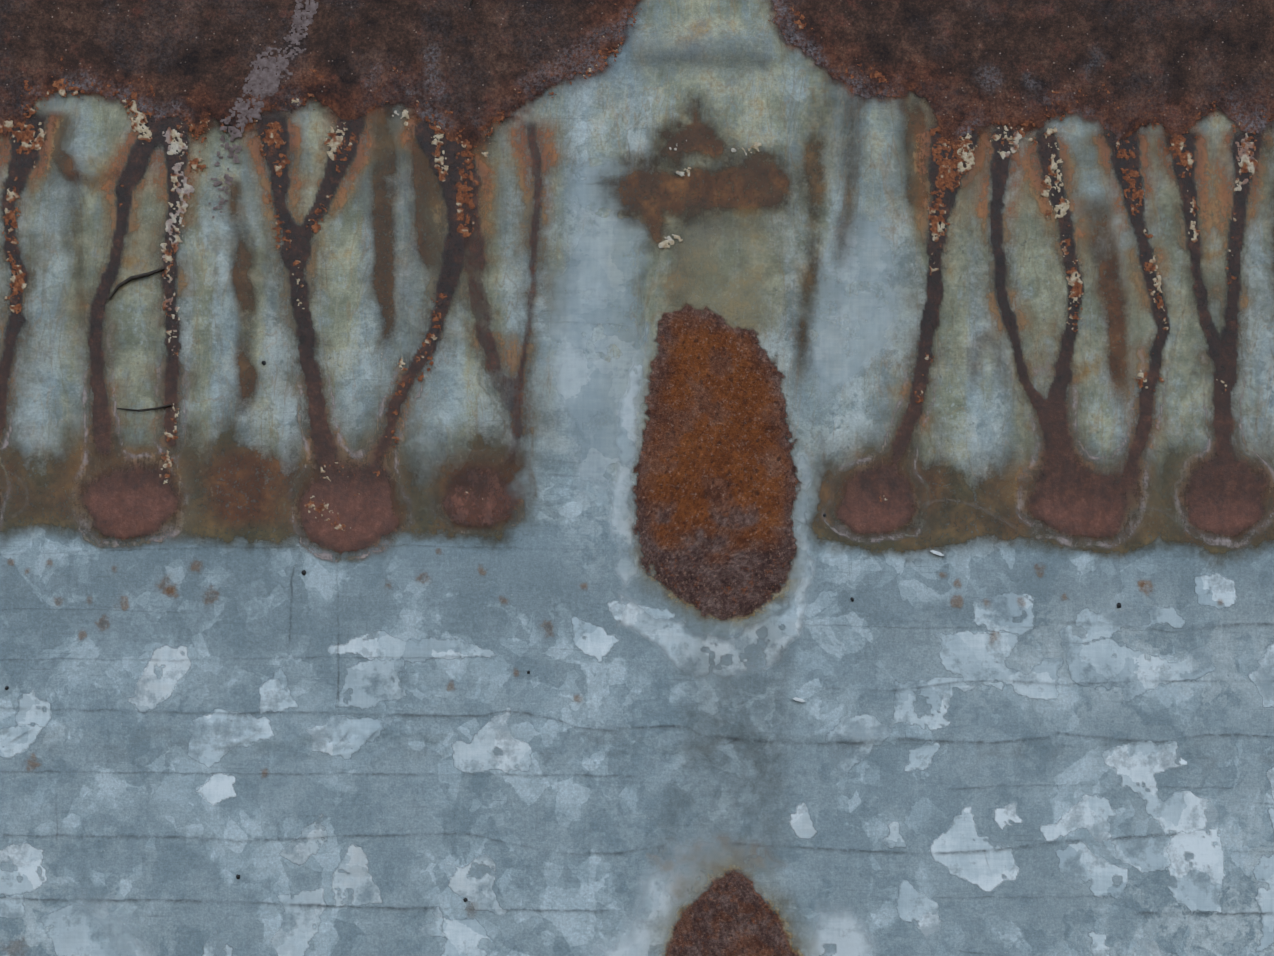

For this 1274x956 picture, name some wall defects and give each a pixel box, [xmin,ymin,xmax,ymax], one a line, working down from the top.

corrosion [0,0,642,562]
corrosion [607,99,825,363]
corrosion [768,0,1274,549]
corrosion [632,303,802,622]
corrosion [664,864,804,956]